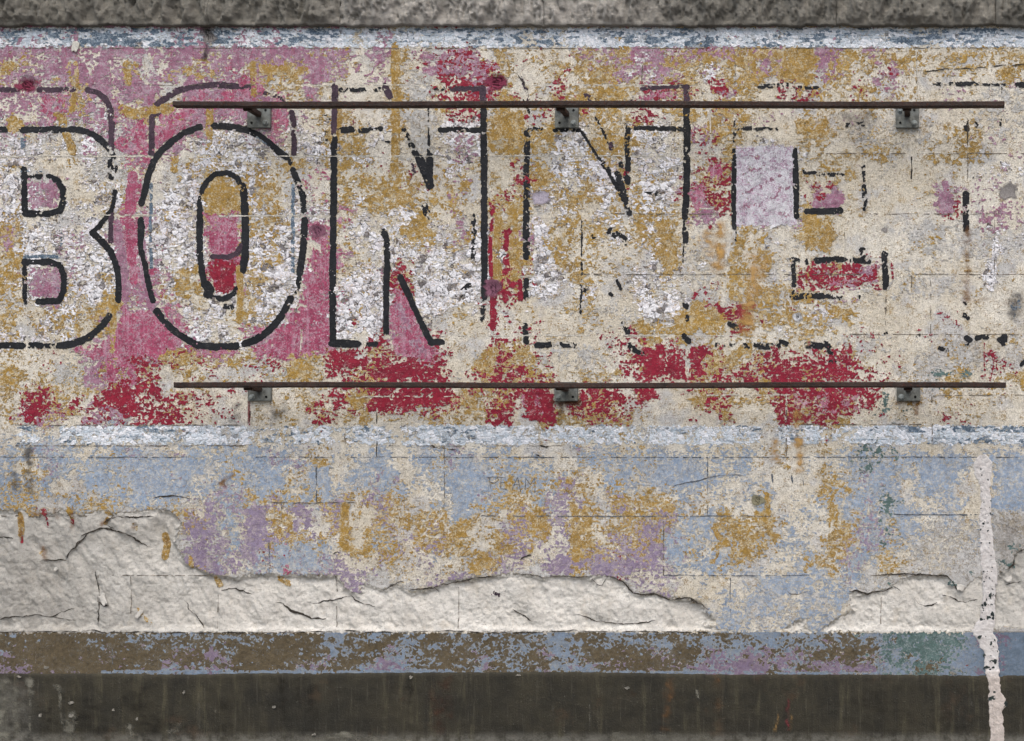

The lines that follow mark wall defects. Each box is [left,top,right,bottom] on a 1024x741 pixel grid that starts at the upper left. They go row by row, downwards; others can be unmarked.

peeling [256,109,291,151]
peeling [522,37,1024,256]
peeling [27,177,60,210]
peeling [335,108,481,296]
peeling [54,232,86,259]
peeling [428,302,474,339]
peeling [683,388,933,432]
peeling [936,388,986,425]
crack [45,495,191,561]
spalling [980,444,1024,677]
crack [0,554,709,634]
crack [849,573,977,607]